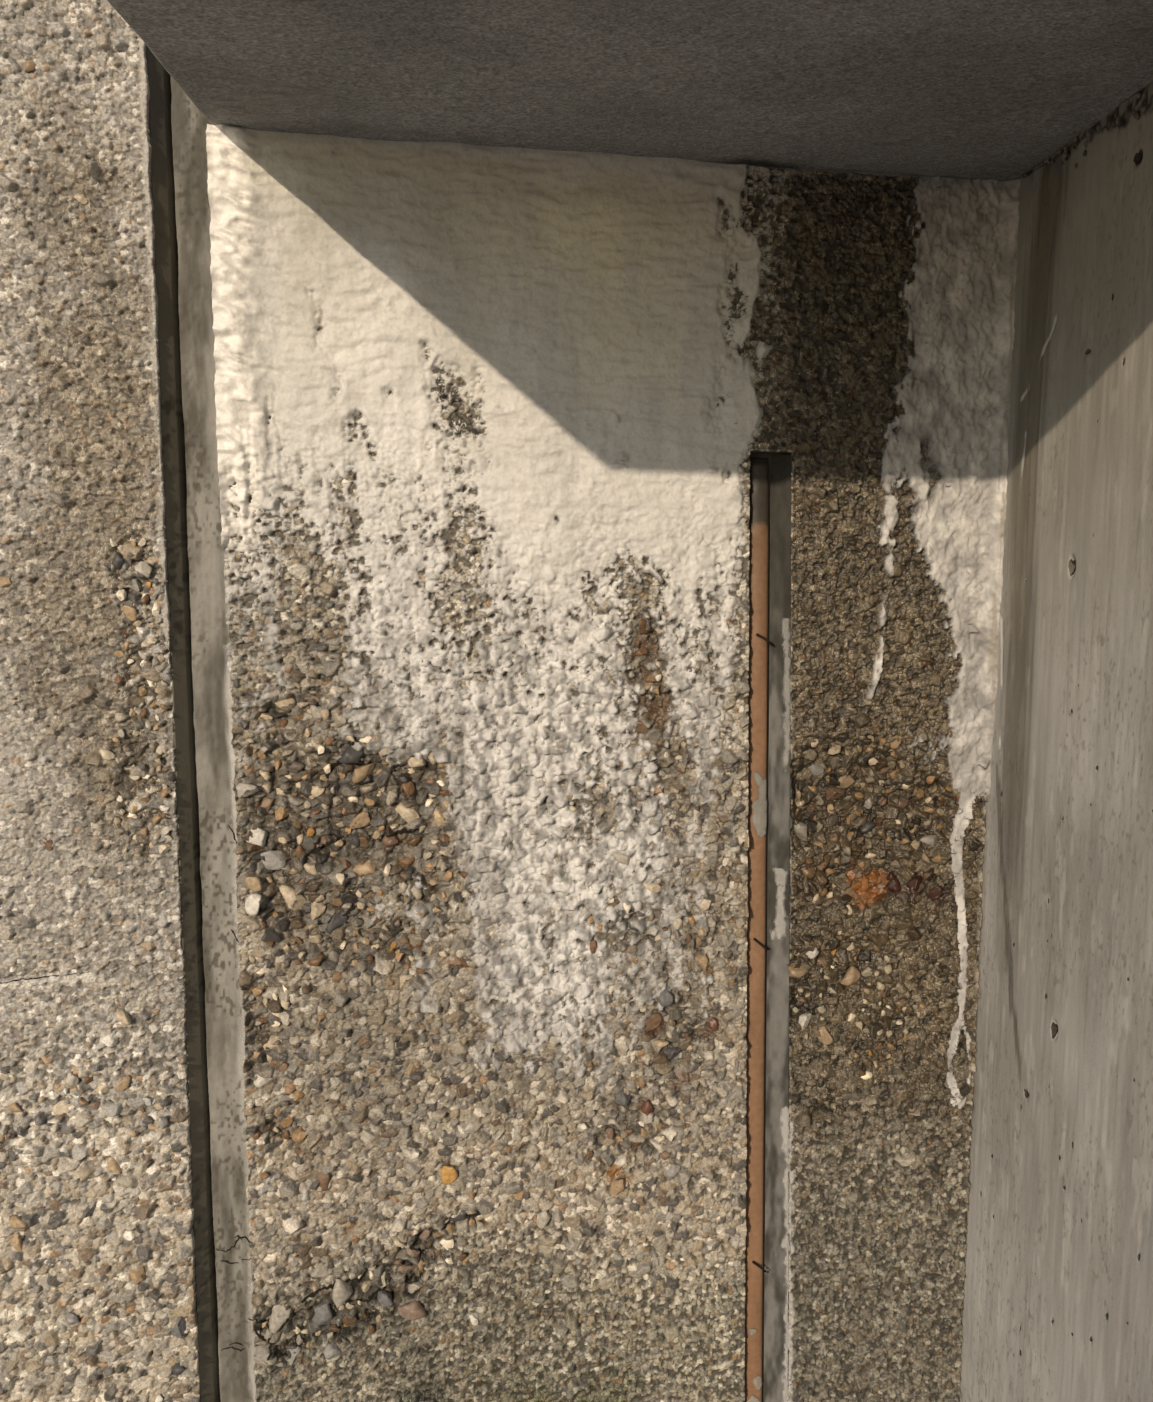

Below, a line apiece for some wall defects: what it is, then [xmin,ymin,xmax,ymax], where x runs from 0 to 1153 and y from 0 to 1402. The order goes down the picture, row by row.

damp [206,124,1062,1402]
rust [847,865,949,909]